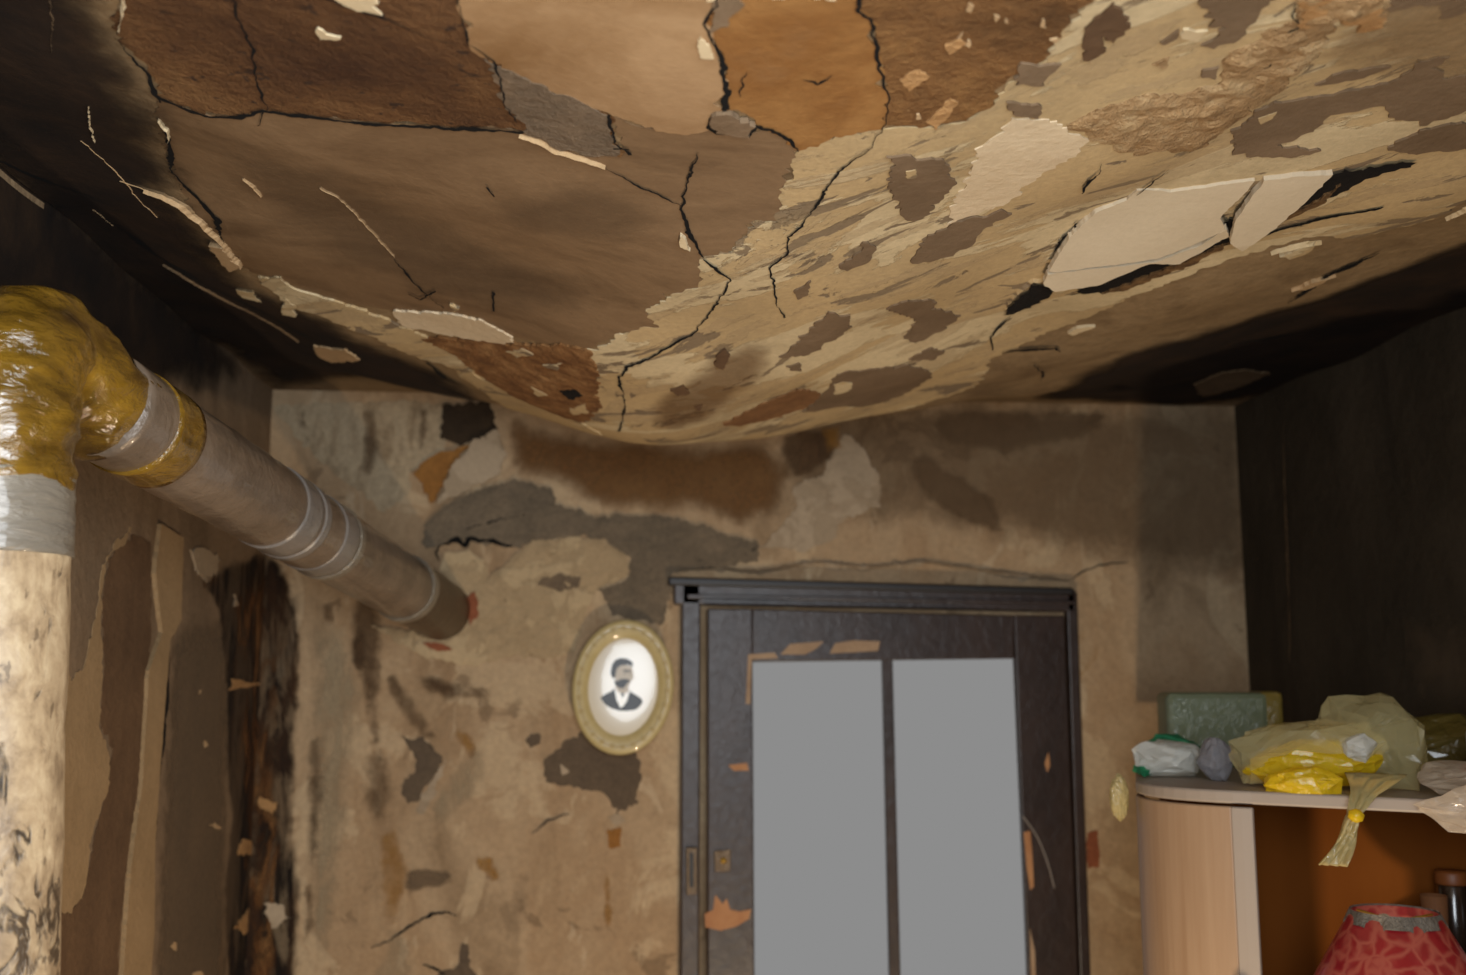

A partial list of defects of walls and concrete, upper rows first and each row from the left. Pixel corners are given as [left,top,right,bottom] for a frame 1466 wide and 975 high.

peeling [110,0,625,158]
crack [0,106,360,363]
crack [114,0,799,432]
peeling [779,311,852,372]
crack [769,0,890,318]
peeling [802,299,961,412]
crack [1053,164,1102,253]
spalling [886,0,1466,351]
crack [1211,253,1379,346]
crack [1266,207,1383,236]
peeling [60,527,152,975]
peeling [526,732,642,849]